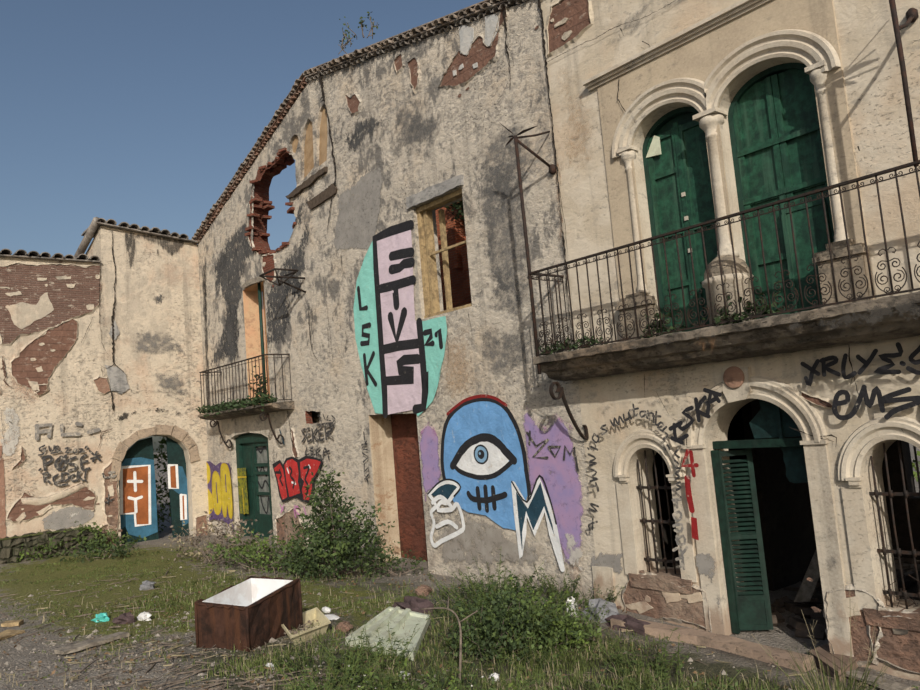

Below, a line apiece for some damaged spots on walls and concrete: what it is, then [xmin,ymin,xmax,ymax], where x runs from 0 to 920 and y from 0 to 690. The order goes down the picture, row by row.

spalling [393,51,422,95]
spalling [438,6,509,98]
spalling [534,0,594,58]
water stain [479,126,528,314]
crack [538,0,674,351]
spalling [0,261,103,398]
spalling [92,375,110,396]
crack [81,234,180,450]
water stain [203,220,252,405]
spalling [6,461,122,546]
spalling [617,570,712,633]